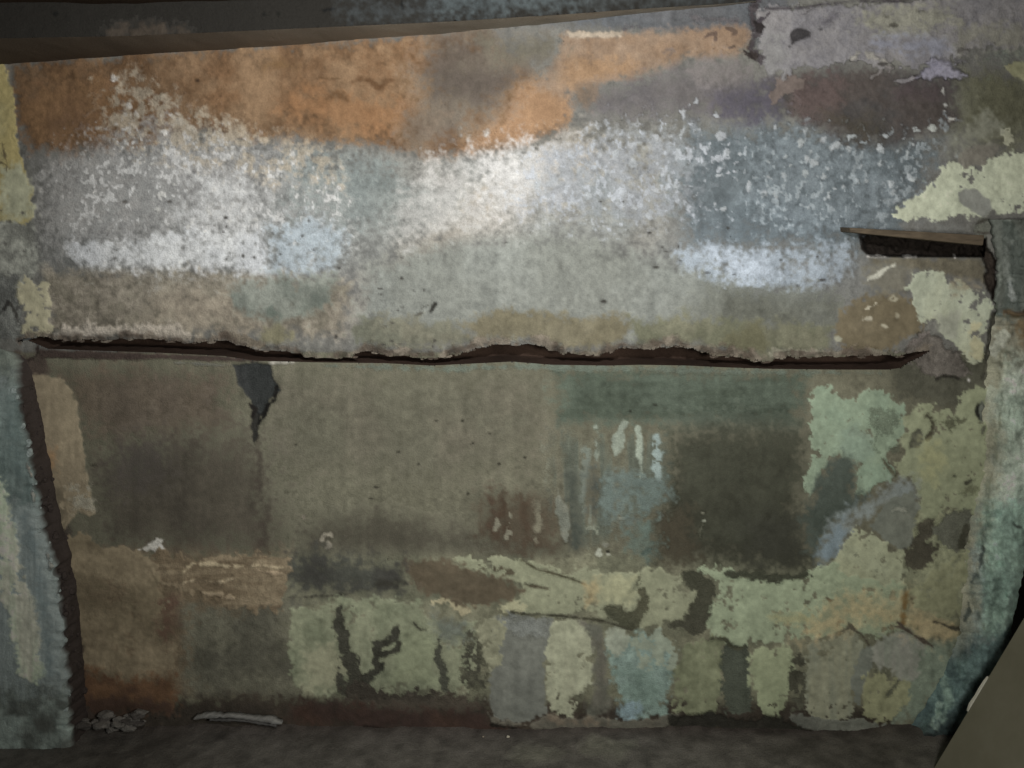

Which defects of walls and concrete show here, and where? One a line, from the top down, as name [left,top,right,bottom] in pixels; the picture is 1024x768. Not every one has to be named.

rust [6,35,429,163]
damp [27,0,979,353]
rust [479,21,751,152]
peeling [891,130,1024,240]
crack [14,324,933,370]
damp [0,390,63,682]
peeling [32,254,1000,731]
damp [530,397,925,584]